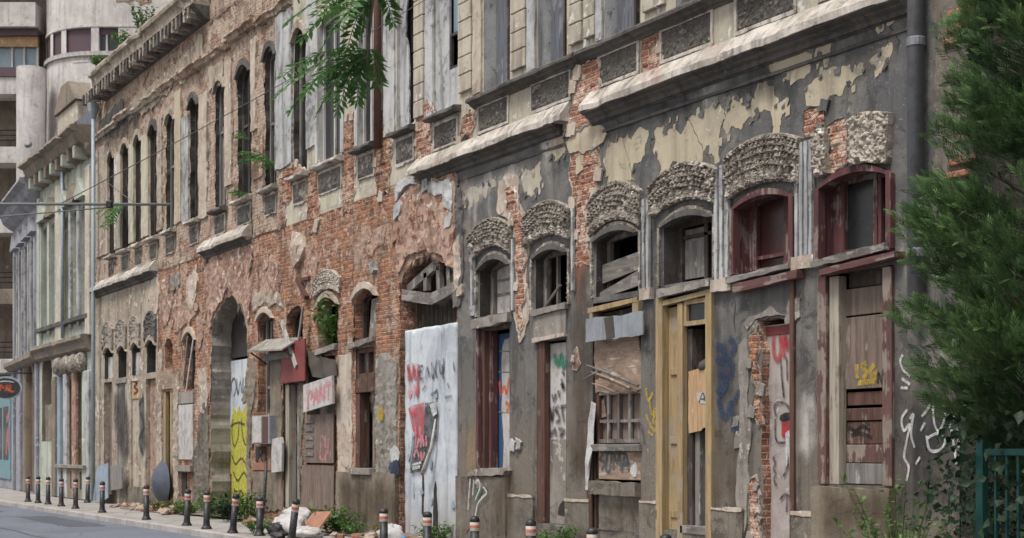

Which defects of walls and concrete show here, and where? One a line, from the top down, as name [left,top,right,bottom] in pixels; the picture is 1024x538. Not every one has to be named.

flaking render [640,32,663,73]
flaking render [341,109,357,216]
flaking render [373,110,402,244]
flaking render [413,99,436,159]
peeling [455,42,893,336]
flaking render [452,283,465,308]
flaking render [731,320,766,448]
flaking render [746,474,763,538]